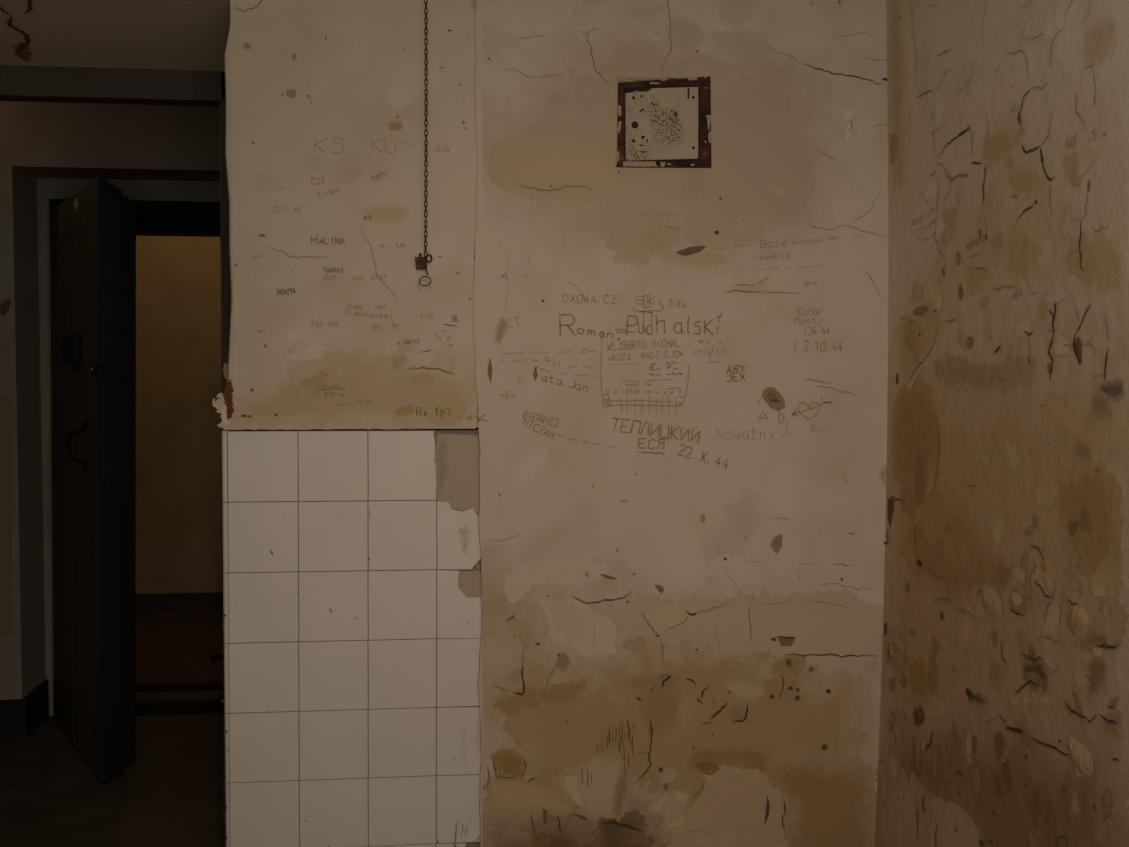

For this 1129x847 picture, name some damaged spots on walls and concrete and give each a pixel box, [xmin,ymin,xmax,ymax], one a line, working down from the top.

crack [0,0,33,54]
crack [909,0,1108,271]
crack [863,262,1000,387]
crack [1024,295,1109,381]
peeling [222,404,252,425]
peeling [437,434,480,513]
peeling [458,564,481,598]
crack [492,649,559,696]
crack [574,543,876,783]